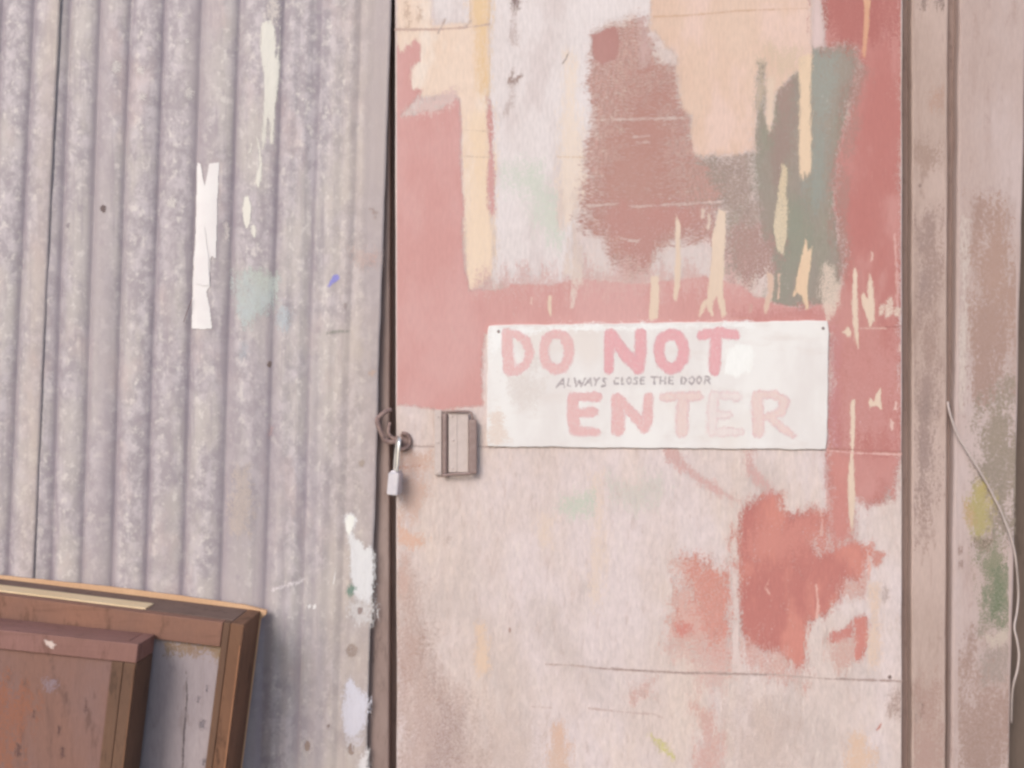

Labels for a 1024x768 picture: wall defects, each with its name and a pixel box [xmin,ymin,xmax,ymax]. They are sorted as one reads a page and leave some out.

water stain [962,189,1016,555]